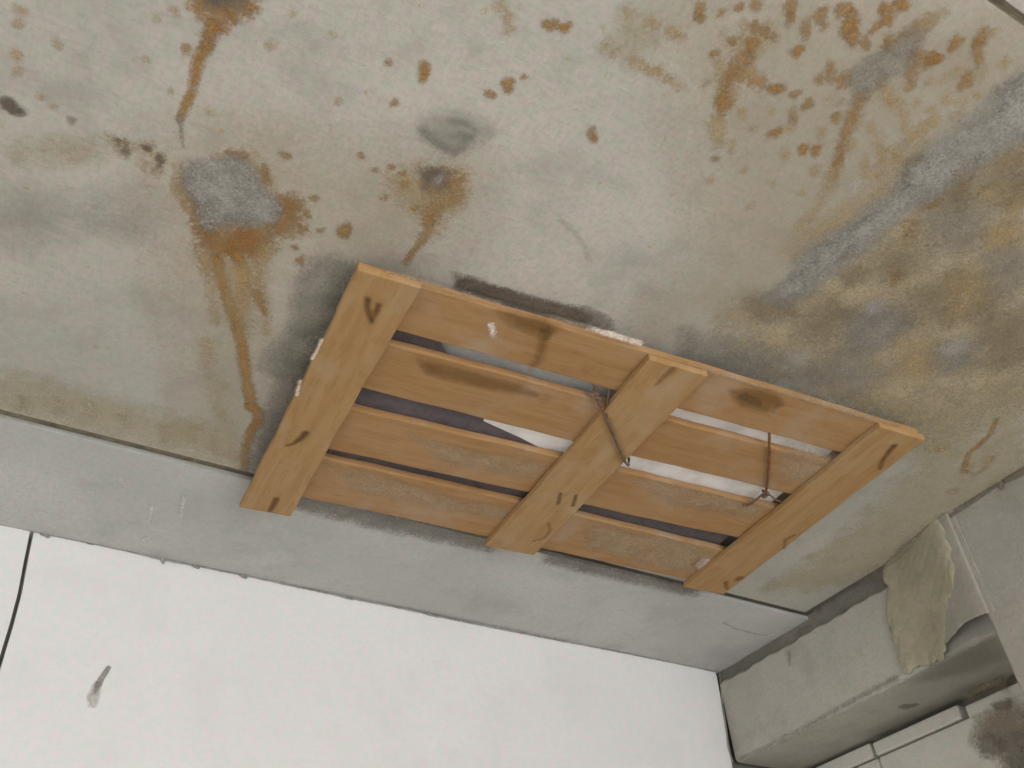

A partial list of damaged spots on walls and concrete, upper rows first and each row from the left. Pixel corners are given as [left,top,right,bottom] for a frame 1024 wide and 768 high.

corrosion [172,0,259,138]
corrosion [419,61,431,82]
corrosion [486,75,526,98]
corrosion [542,19,571,31]
corrosion [709,1,814,149]
corrosion [785,0,909,56]
corrosion [927,27,994,105]
corrosion [381,162,470,265]
corrosion [113,138,321,471]
leakage [683,135,1024,451]